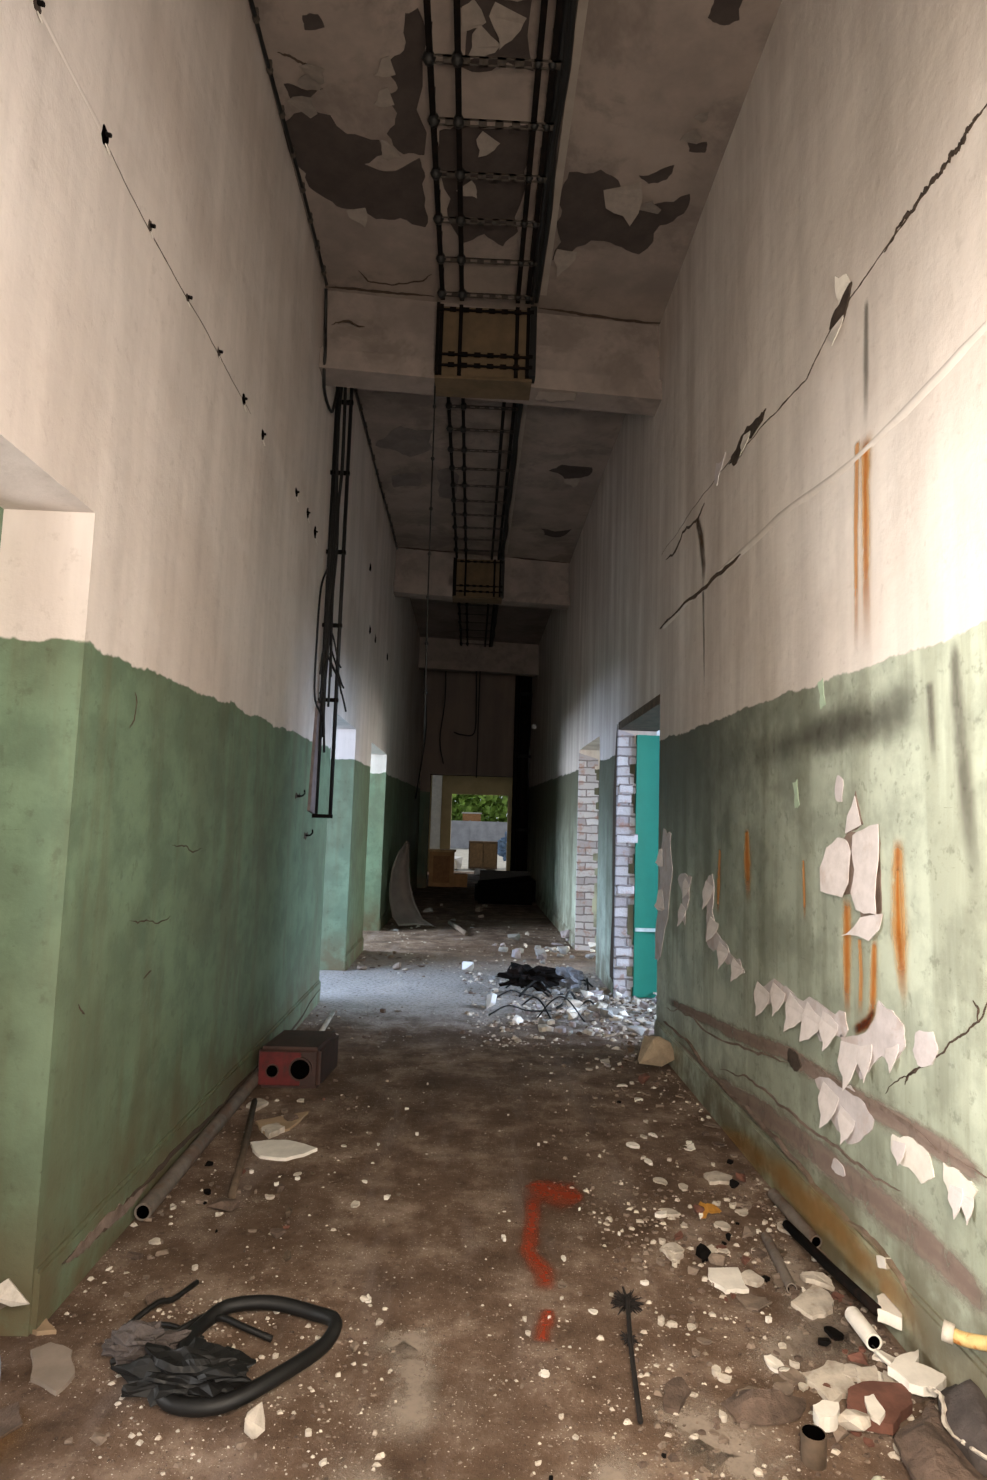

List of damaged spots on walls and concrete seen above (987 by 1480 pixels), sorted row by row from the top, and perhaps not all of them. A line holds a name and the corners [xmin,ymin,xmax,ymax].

crack [108,147,251,414]
crack [277,52,307,65]
peeling [283,0,533,246]
peeling [552,165,690,277]
crack [849,104,987,301]
crack [662,330,831,560]
rust [854,442,870,600]
flaking render [575,724,638,998]
peeling [820,775,883,941]
rust [843,846,906,1033]
spalling [654,828,987,1311]
crack [885,1001,987,1094]